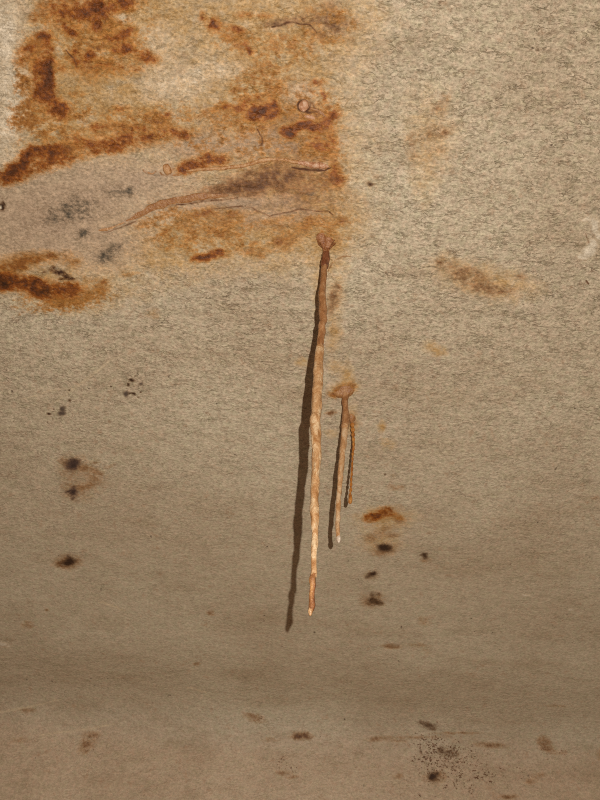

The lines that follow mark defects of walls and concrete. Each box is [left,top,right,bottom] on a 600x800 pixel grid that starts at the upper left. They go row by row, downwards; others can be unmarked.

rust [0,0,356,190]
rust [209,167,303,195]
rust [137,206,349,262]
rust [0,252,111,312]
rust [329,284,341,310]
water stain [62,459,102,500]
rust [364,507,403,555]
water stain [56,556,79,568]